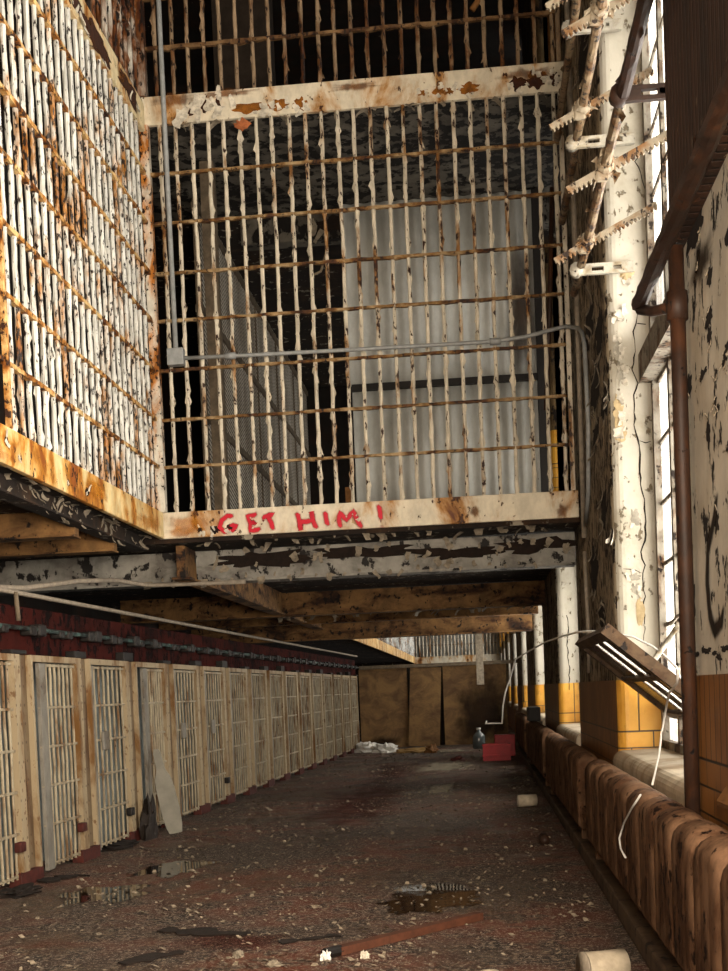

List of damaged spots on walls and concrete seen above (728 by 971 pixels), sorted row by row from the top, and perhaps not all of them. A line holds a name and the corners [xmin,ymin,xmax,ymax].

peeling [355,81,480,118]
peeling [686,209,713,288]
peeling [702,306,713,353]
peeling [688,341,728,399]
peeling [704,395,720,449]
peeling [0,428,152,549]
peeling [196,514,577,588]
peeling [587,489,614,629]
flaking render [624,568,645,626]